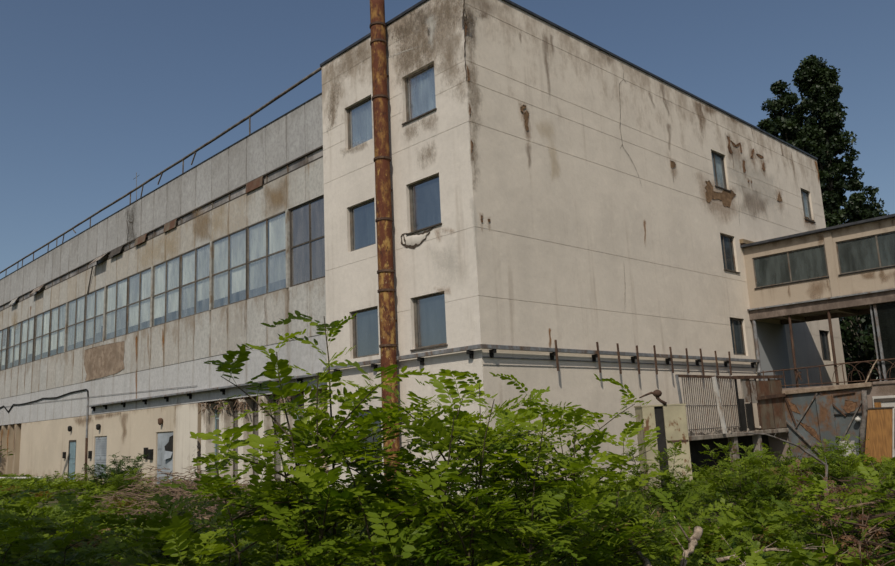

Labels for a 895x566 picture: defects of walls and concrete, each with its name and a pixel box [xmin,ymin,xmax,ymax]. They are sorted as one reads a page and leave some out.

peeling [727,136,765,183]
spalling [705,181,736,207]